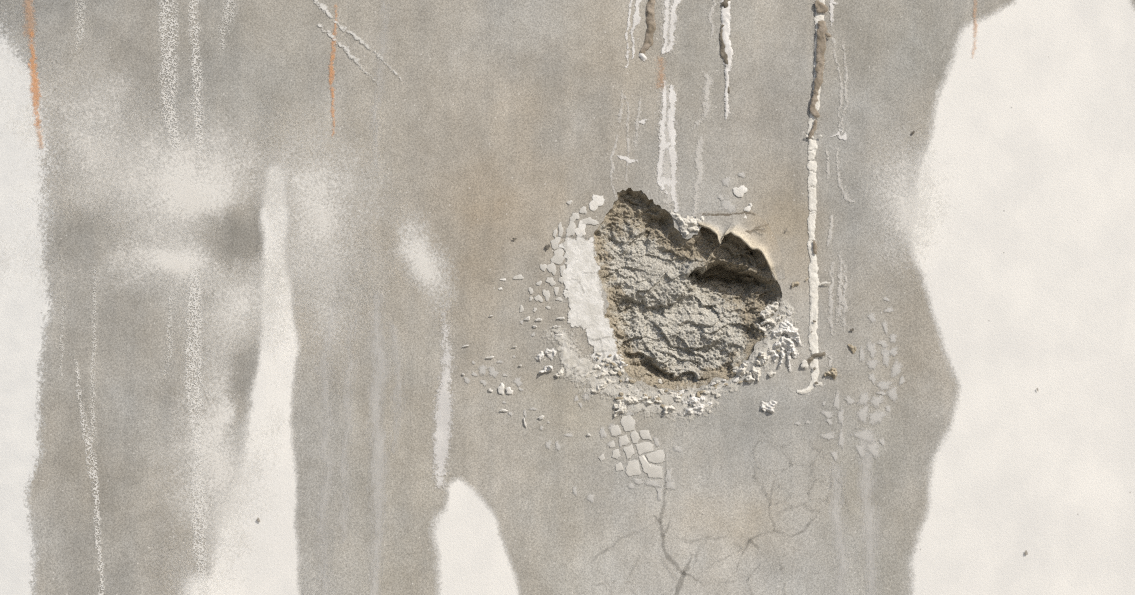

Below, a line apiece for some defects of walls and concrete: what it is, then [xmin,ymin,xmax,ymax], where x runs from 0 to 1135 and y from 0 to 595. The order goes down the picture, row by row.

rust [29,32,40,125]
water stain [158,0,206,167]
spalling [498,188,782,391]
water stain [610,81,679,212]
water stain [625,0,681,68]
water stain [693,0,733,216]
peeling [718,172,752,219]
water stain [797,0,854,394]
water stain [59,269,105,595]
water stain [163,264,208,595]
water stain [432,296,454,488]
peeling [462,346,572,450]